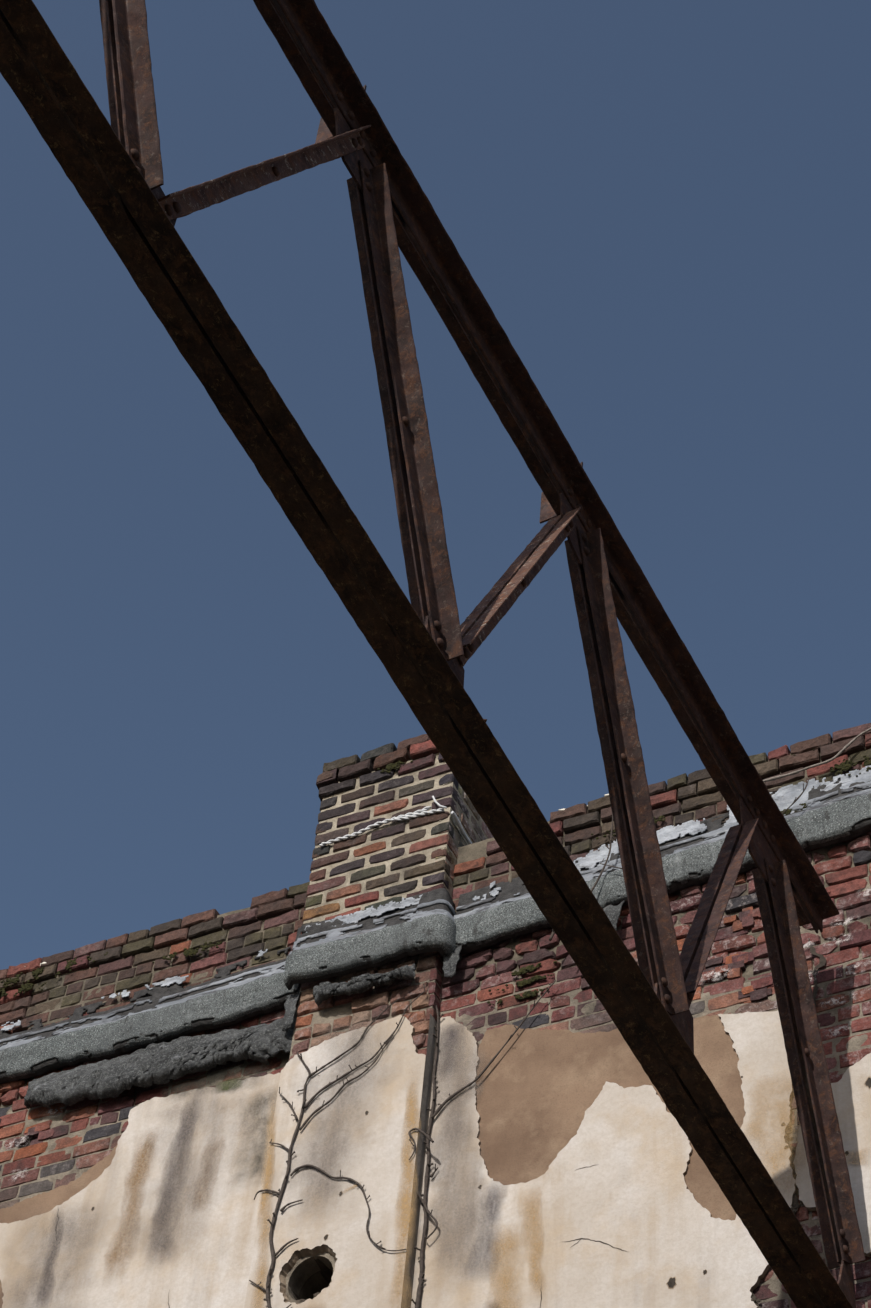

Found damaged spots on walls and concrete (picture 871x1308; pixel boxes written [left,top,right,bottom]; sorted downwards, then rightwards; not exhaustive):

peeling [1,1020,21,1031]
spalling [14,1120,54,1147]
peeling [0,1143,118,1224]
leakage [110,1142,152,1262]
peeling [145,975,189,990]
leakage [157,1114,193,1246]
corrosion [397,1095,416,1294]
peeling [476,1025,670,1189]
peeling [684,1140,736,1221]
peeling [693,1015,746,1128]
spalling [781,1122,799,1214]
spalling [280,1234,337,1304]